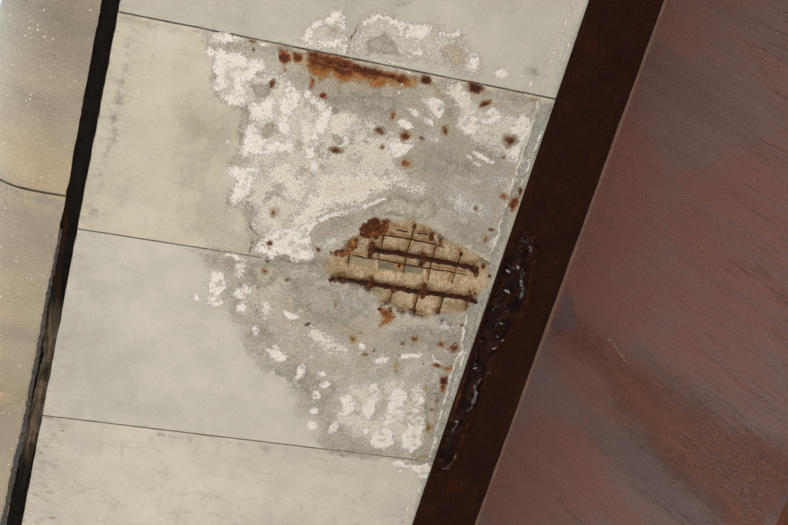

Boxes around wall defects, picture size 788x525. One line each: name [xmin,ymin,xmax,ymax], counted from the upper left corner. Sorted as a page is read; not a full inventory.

water stain [200,30,244,45]
corrosion [278,49,439,101]
corrosion [468,82,492,109]
water stain [405,96,445,126]
corrosion [399,131,425,141]
corrosion [502,134,519,159]
corrosion [499,186,523,212]
peeling [197,7,552,464]
water stain [187,248,248,309]
water stain [327,103,551,510]
water stain [266,343,290,363]
water stain [306,371,332,431]